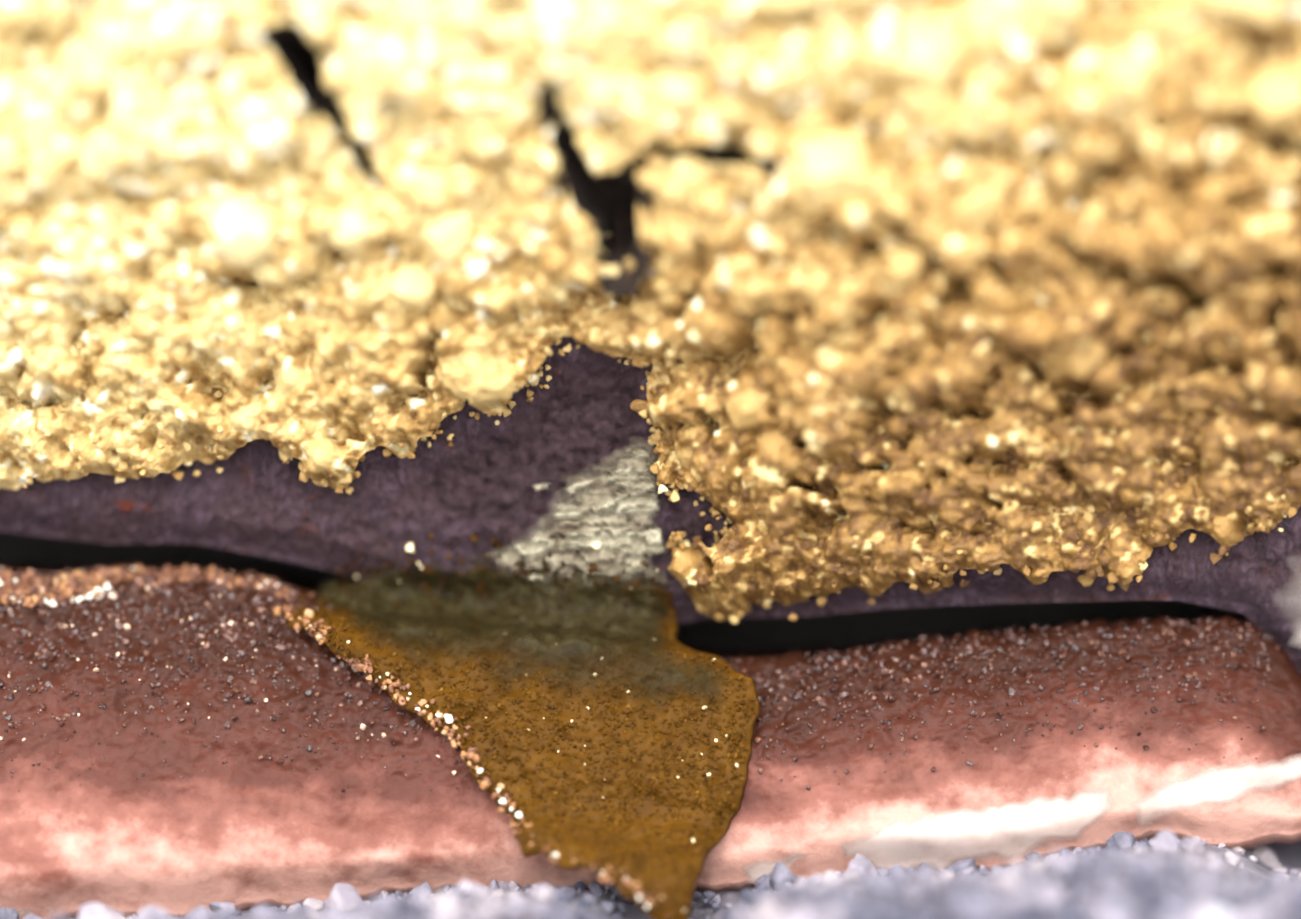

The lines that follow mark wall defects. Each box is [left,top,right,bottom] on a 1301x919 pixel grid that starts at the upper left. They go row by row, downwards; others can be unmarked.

crack [259,6,382,184]
crack [536,79,780,295]